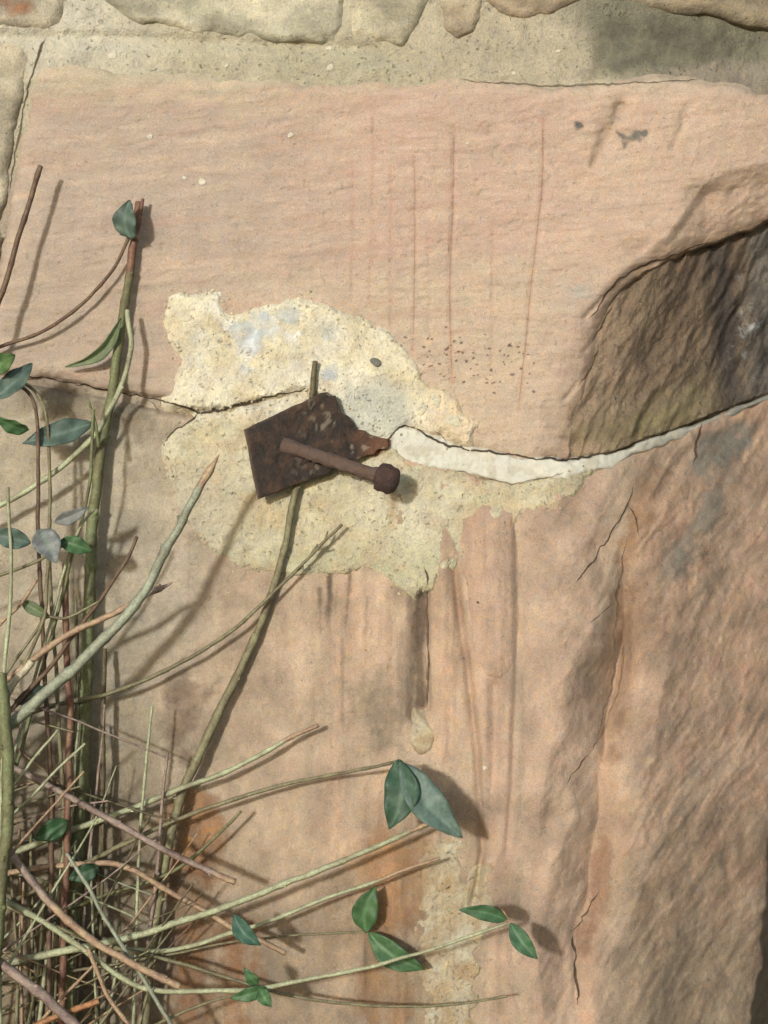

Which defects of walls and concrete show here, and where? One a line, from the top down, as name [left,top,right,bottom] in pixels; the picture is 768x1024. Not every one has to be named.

crack [29,376,305,443]
peeling [157,223,768,600]
crack [388,391,768,485]
water stain [415,591,426,707]
crack [567,489,639,785]
crack [571,893,598,1004]